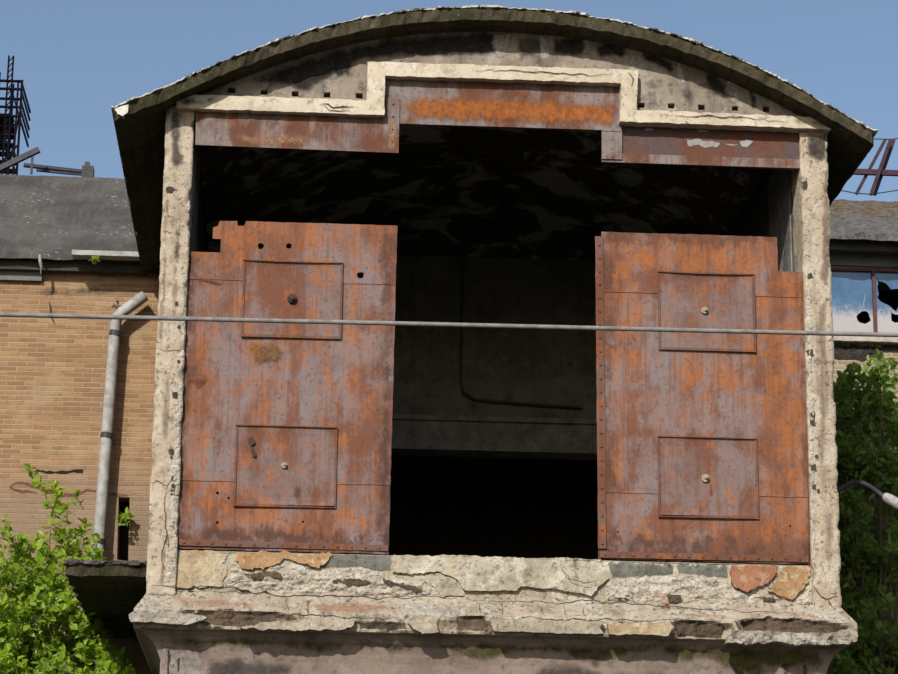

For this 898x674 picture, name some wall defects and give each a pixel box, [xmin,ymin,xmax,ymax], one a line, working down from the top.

damp [539,36,548,59]
rust [409,98,612,125]
peeling [687,130,753,148]
crack [9,482,128,497]
crack [150,480,838,623]
spalling [135,594,164,612]